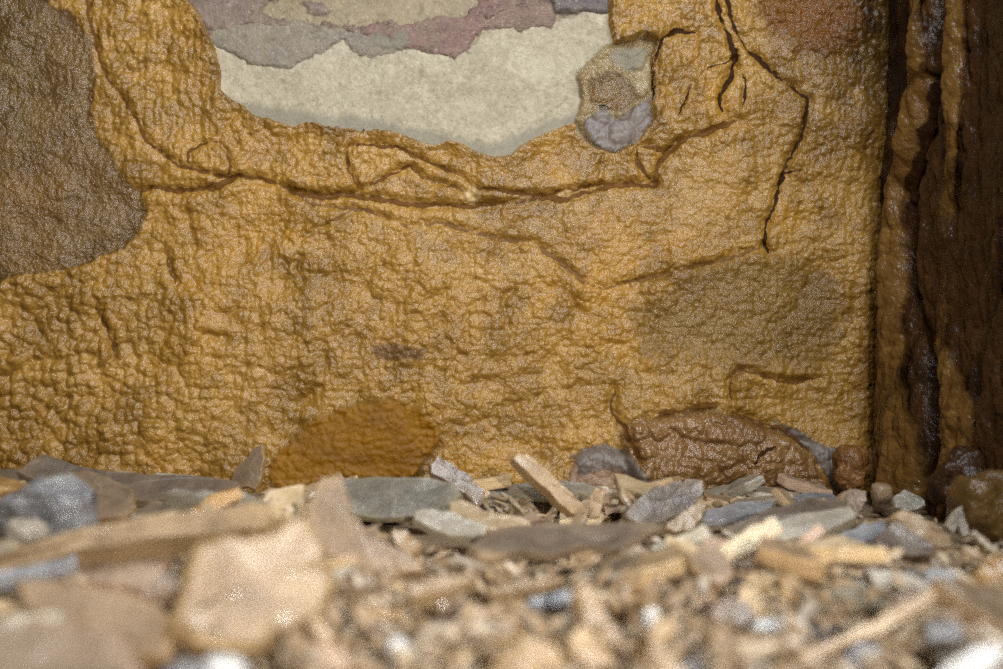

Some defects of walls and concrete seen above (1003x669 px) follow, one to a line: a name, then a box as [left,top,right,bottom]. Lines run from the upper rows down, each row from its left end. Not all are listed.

leakage [0,0,147,282]
spalling [188,0,656,157]
crack [86,0,810,289]